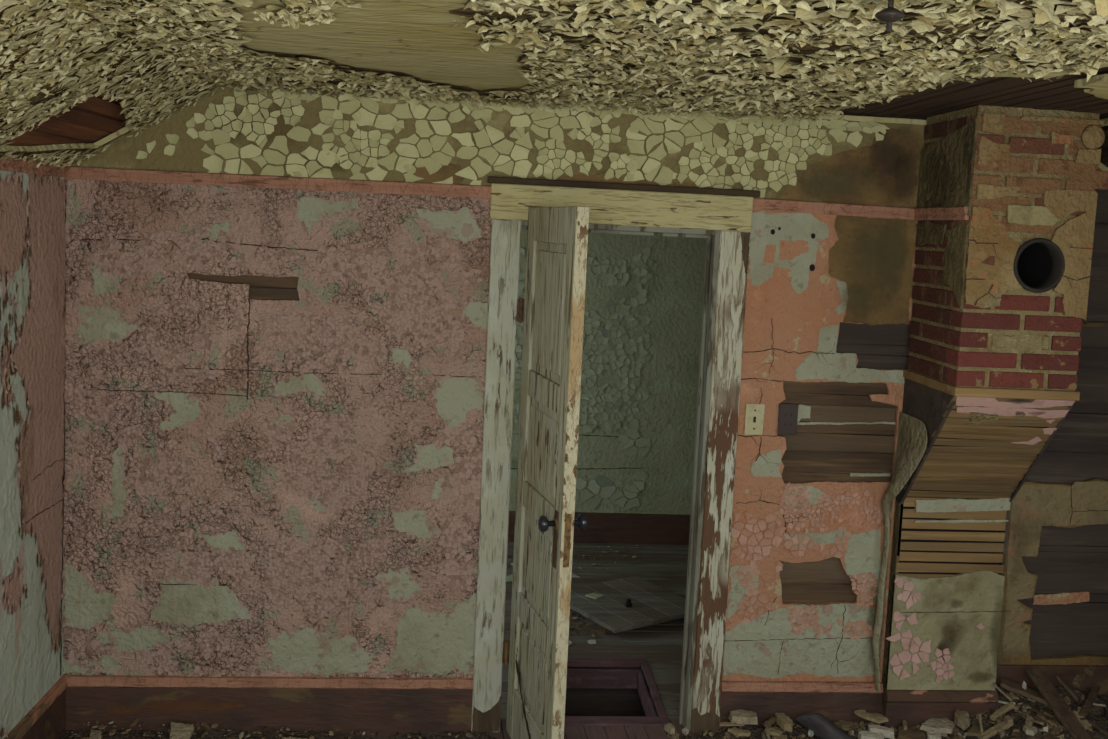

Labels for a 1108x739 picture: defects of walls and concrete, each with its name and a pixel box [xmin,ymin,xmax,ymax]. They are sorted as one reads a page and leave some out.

peeling [0,0,1108,207]
peeling [0,171,265,677]
peeling [513,321,524,429]
peeling [575,470,648,510]
peeling [579,248,654,456]
flaking render [749,212,916,383]
peeling [723,449,955,683]
crack [966,240,1006,306]
flaking render [1002,481,1108,659]